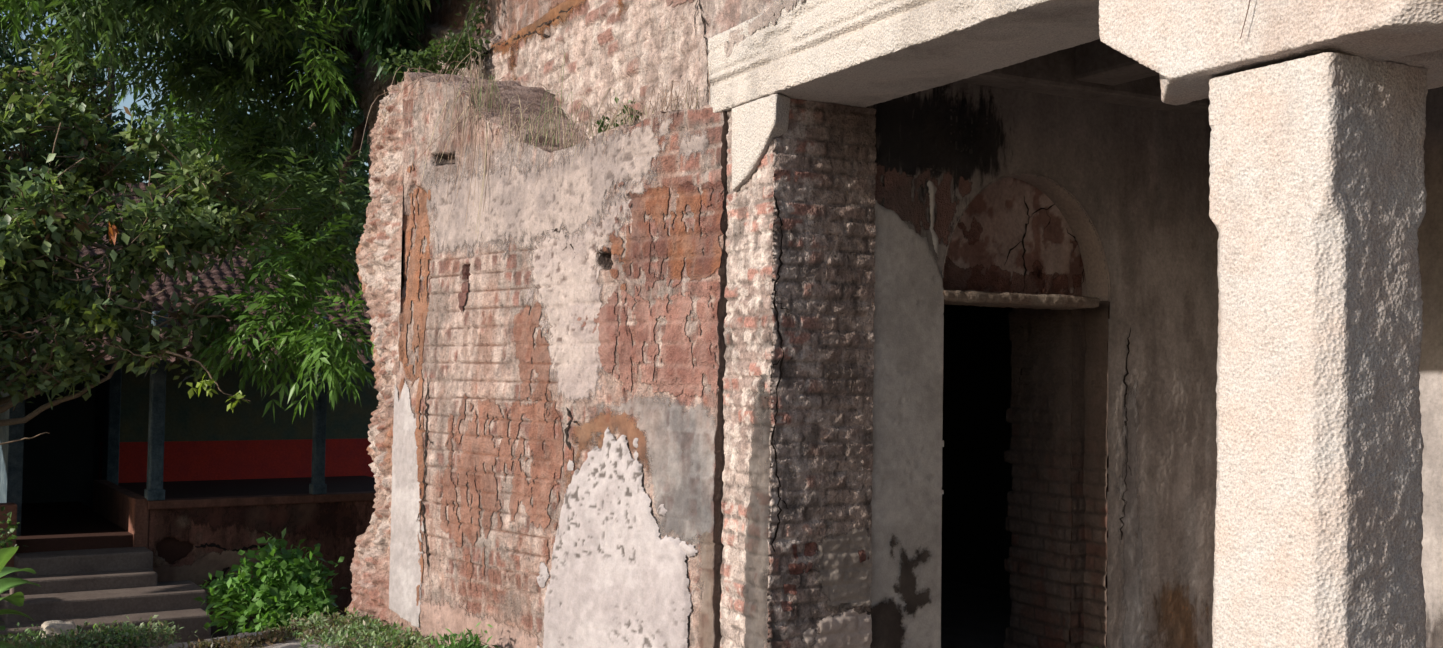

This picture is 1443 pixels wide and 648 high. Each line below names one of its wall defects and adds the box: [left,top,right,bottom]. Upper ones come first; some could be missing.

flaking render [724,0,804,57]
flaking render [389,116,724,648]
crack [770,192,789,558]
spalling [781,542,817,612]
flaking render [802,180,1084,648]
crack [1005,196,1084,291]